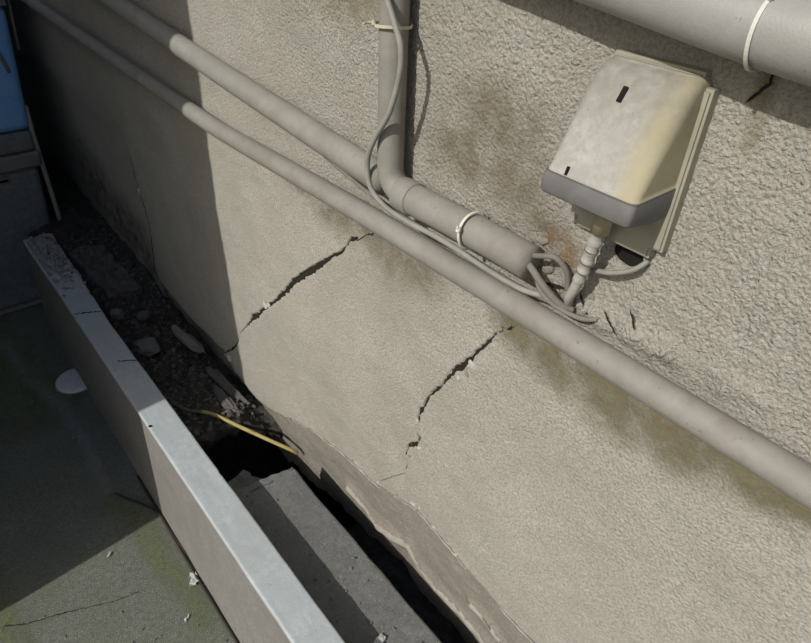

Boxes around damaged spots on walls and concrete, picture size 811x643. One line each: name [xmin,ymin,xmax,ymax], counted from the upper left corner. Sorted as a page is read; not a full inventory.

crack [745,74,774,103]
crack [225,233,374,362]
crack [381,326,513,481]